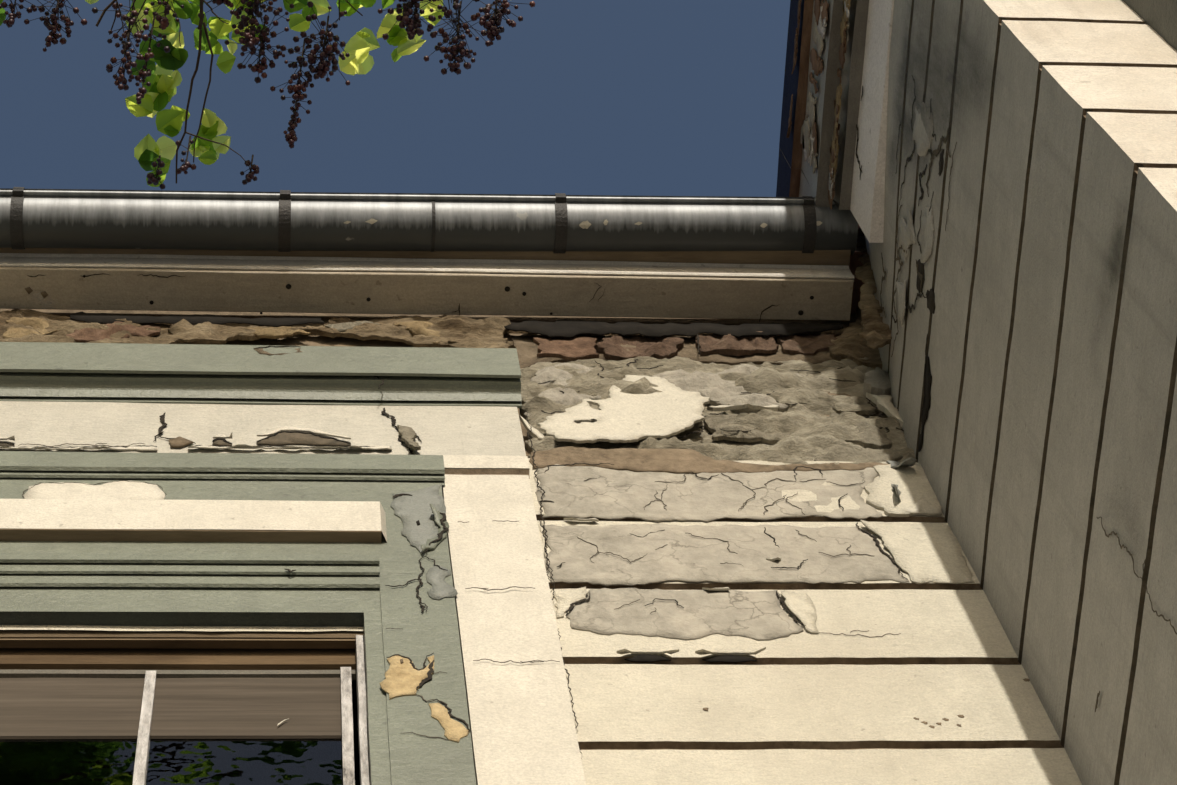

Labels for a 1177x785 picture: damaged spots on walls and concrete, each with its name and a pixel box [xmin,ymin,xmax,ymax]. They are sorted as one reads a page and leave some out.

peeling [786,0,850,209]
spalling [0,75,975,640]
crack [920,334,928,422]
peeling [380,653,471,743]
crack [385,410,555,629]
crack [473,628,582,759]
crack [807,629,901,637]
crack [1097,517,1177,634]